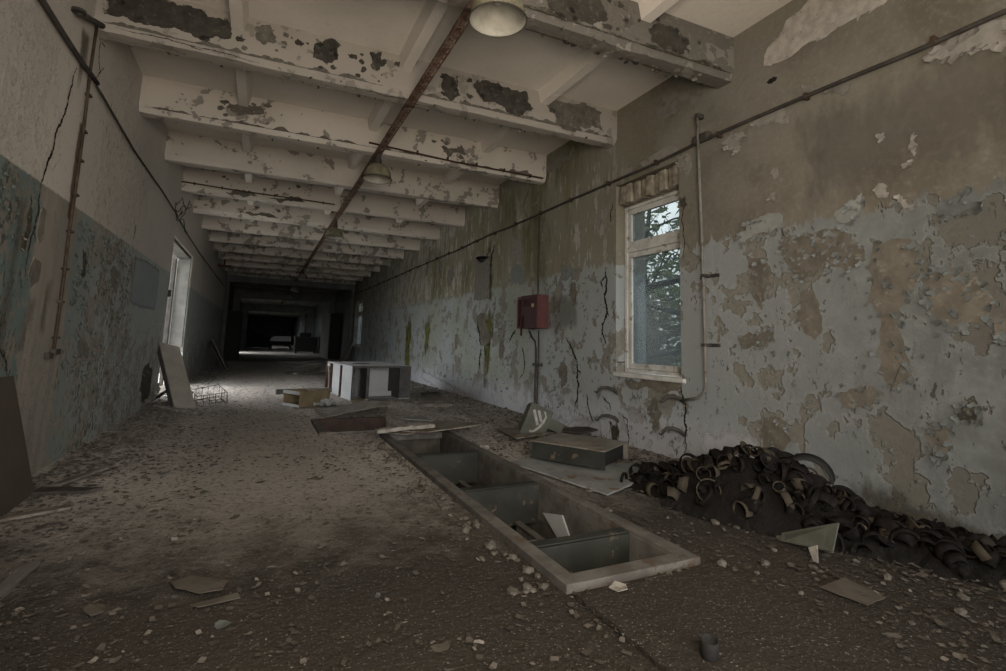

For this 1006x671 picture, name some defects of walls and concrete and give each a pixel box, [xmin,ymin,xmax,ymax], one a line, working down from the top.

peeling [524,0,729,87]
peeling [764,0,887,67]
peeling [923,19,1006,65]
peeling [70,222,131,328]
crack [600,269,609,344]
peeling [733,166,1006,416]
flaking render [139,363,153,405]
crack [566,339,629,444]
peeling [759,417,798,454]
peeling [919,395,984,469]